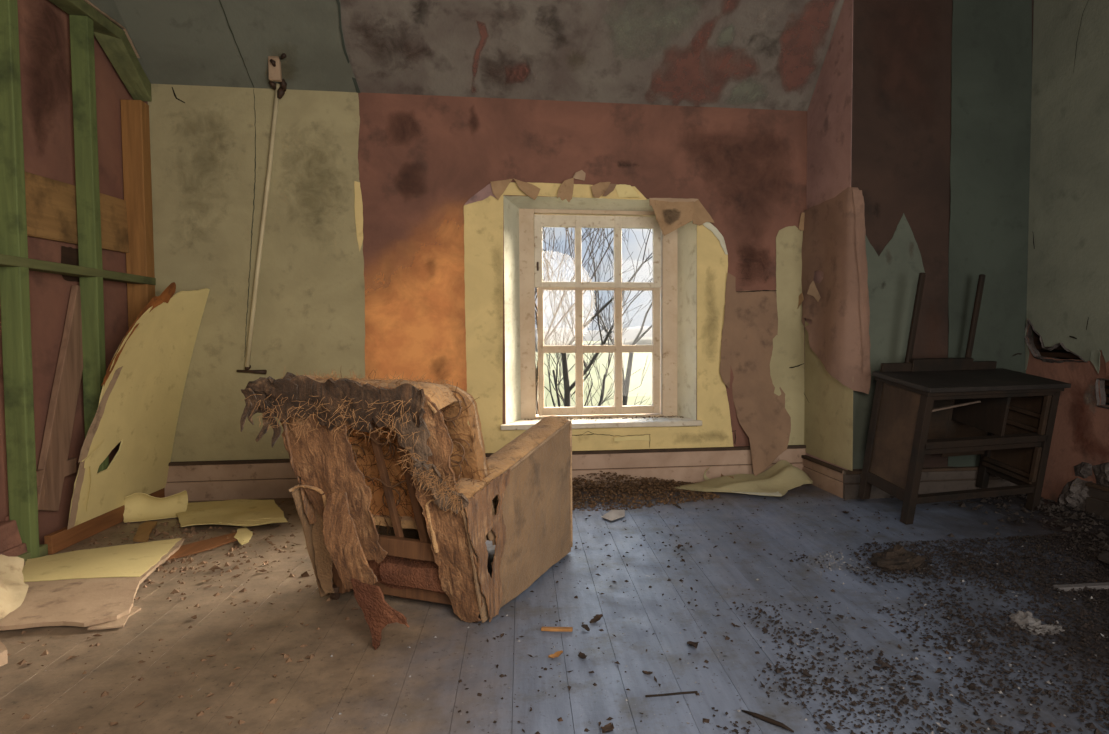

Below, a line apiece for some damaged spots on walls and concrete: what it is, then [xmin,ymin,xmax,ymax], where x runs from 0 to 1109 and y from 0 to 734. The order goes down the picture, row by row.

flaking render [1025,319,1088,363]
flaking render [1095,378,1109,409]